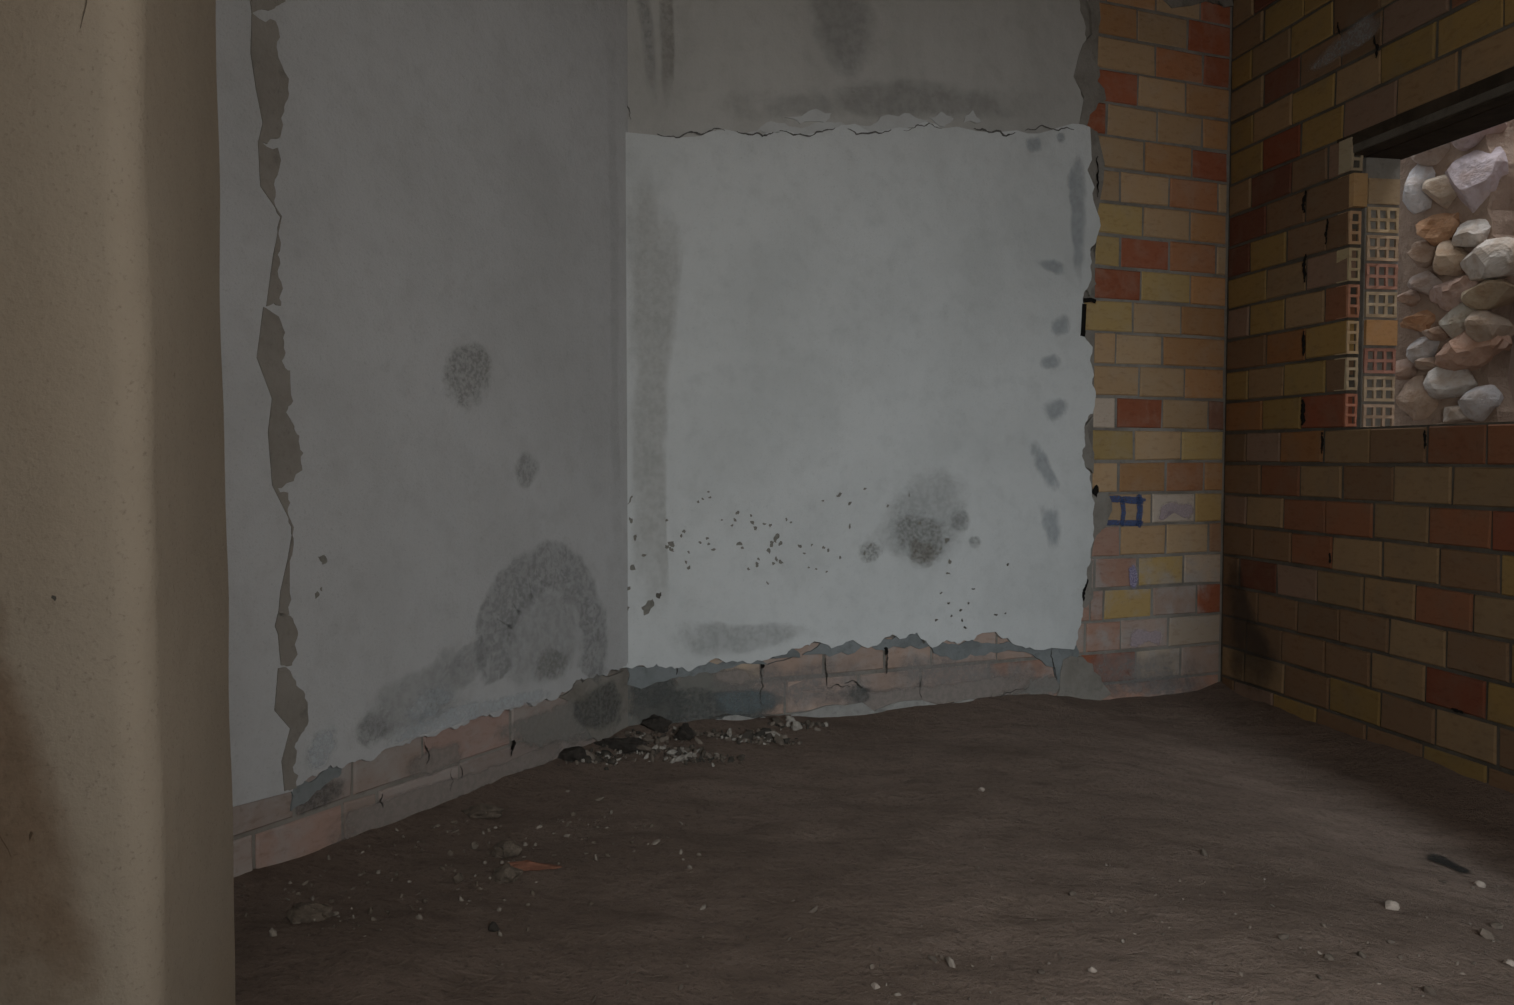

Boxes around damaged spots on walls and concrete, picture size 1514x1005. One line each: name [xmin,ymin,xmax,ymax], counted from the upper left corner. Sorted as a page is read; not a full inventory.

peeling [748,109,981,135]
peeling [1074,0,1106,213]
spalling [250,0,342,811]
peeling [1082,417,1112,608]
spalling [342,588,1191,840]